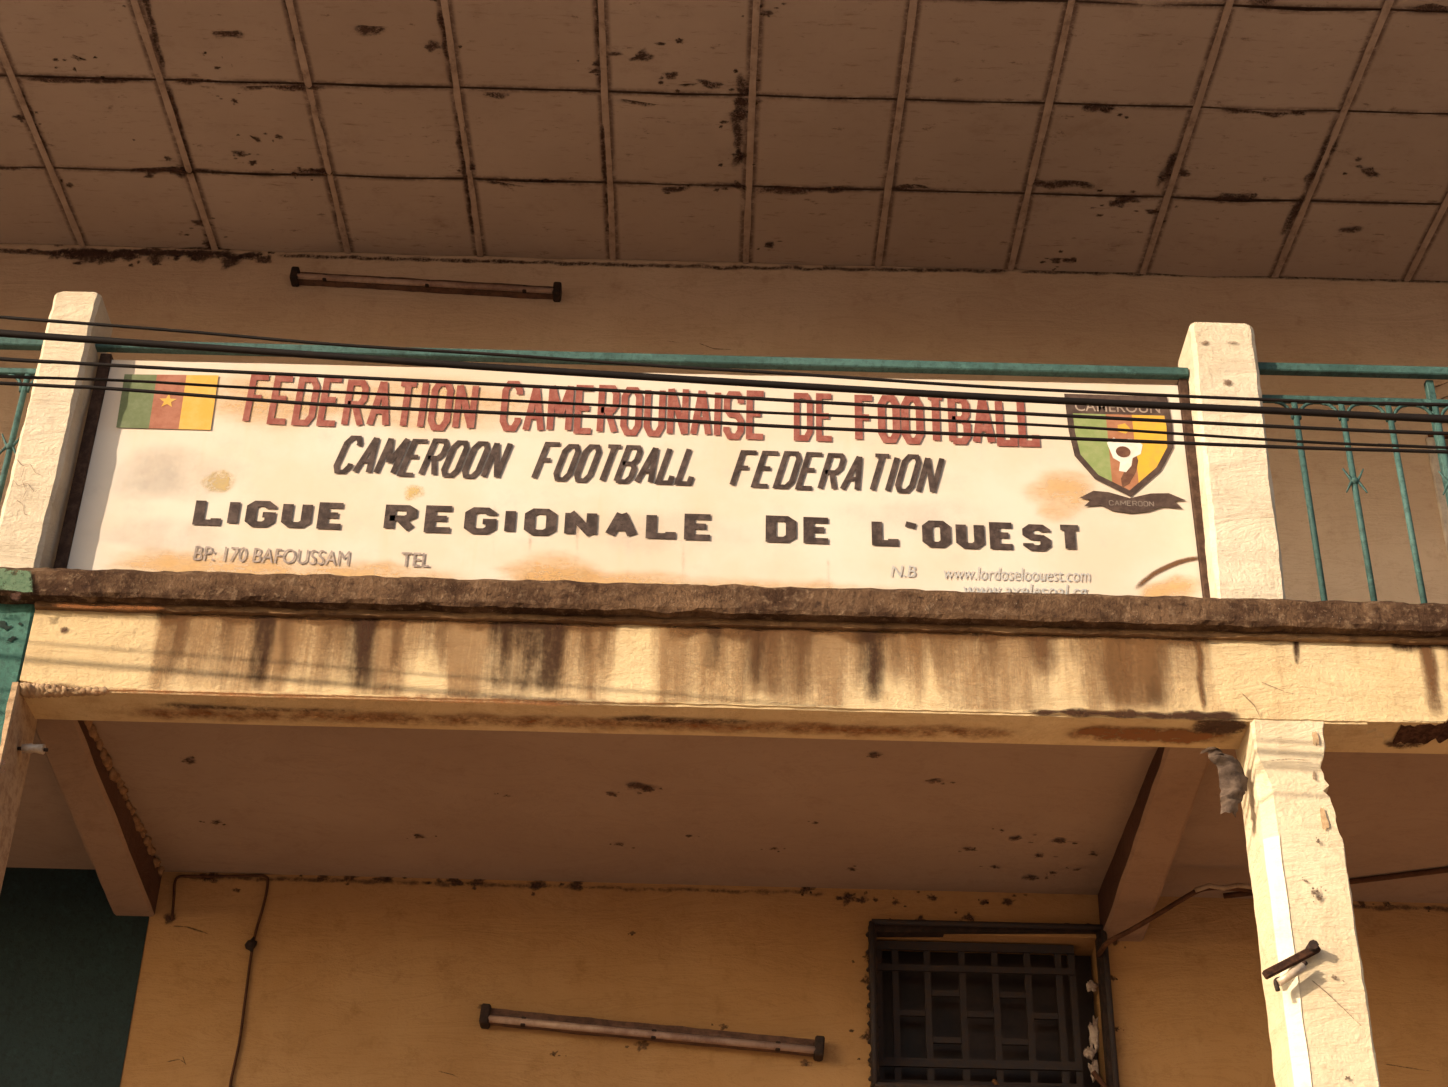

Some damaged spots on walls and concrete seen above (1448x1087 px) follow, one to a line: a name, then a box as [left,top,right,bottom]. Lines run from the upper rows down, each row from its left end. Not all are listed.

peeling [0,568,33,592]
water stain [153,613,616,699]
water stain [659,626,1208,707]
spalling [1385,719,1448,748]